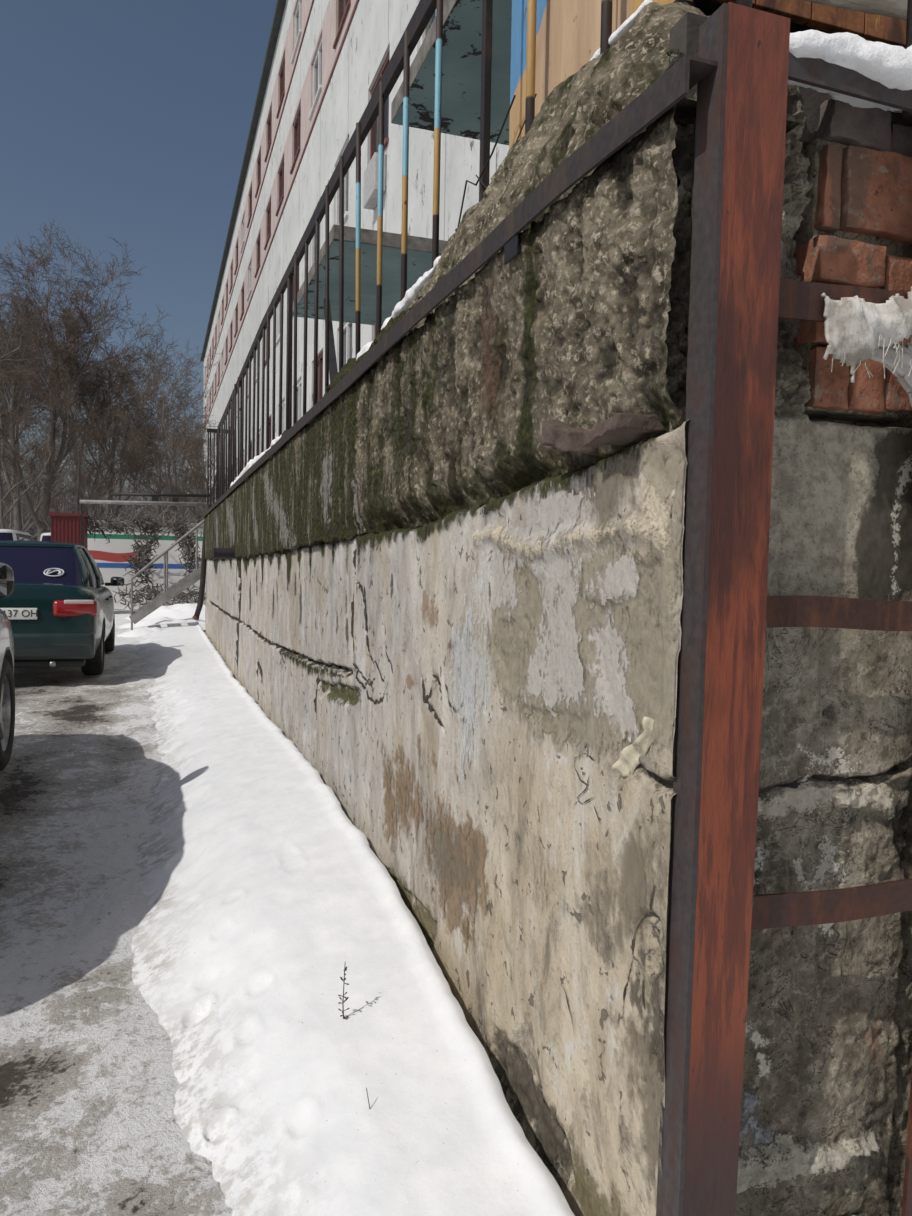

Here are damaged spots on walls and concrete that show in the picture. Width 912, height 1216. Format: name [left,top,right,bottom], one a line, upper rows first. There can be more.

water stain [215,499,235,547]
water stain [252,469,299,551]
water stain [319,452,332,525]
water stain [351,480,365,534]
spalling [272,568,316,627]
crack [210,549,392,721]
peeling [487,438,685,797]
crack [422,675,464,727]
water stain [388,867,437,949]
water stain [488,1028,625,1216]